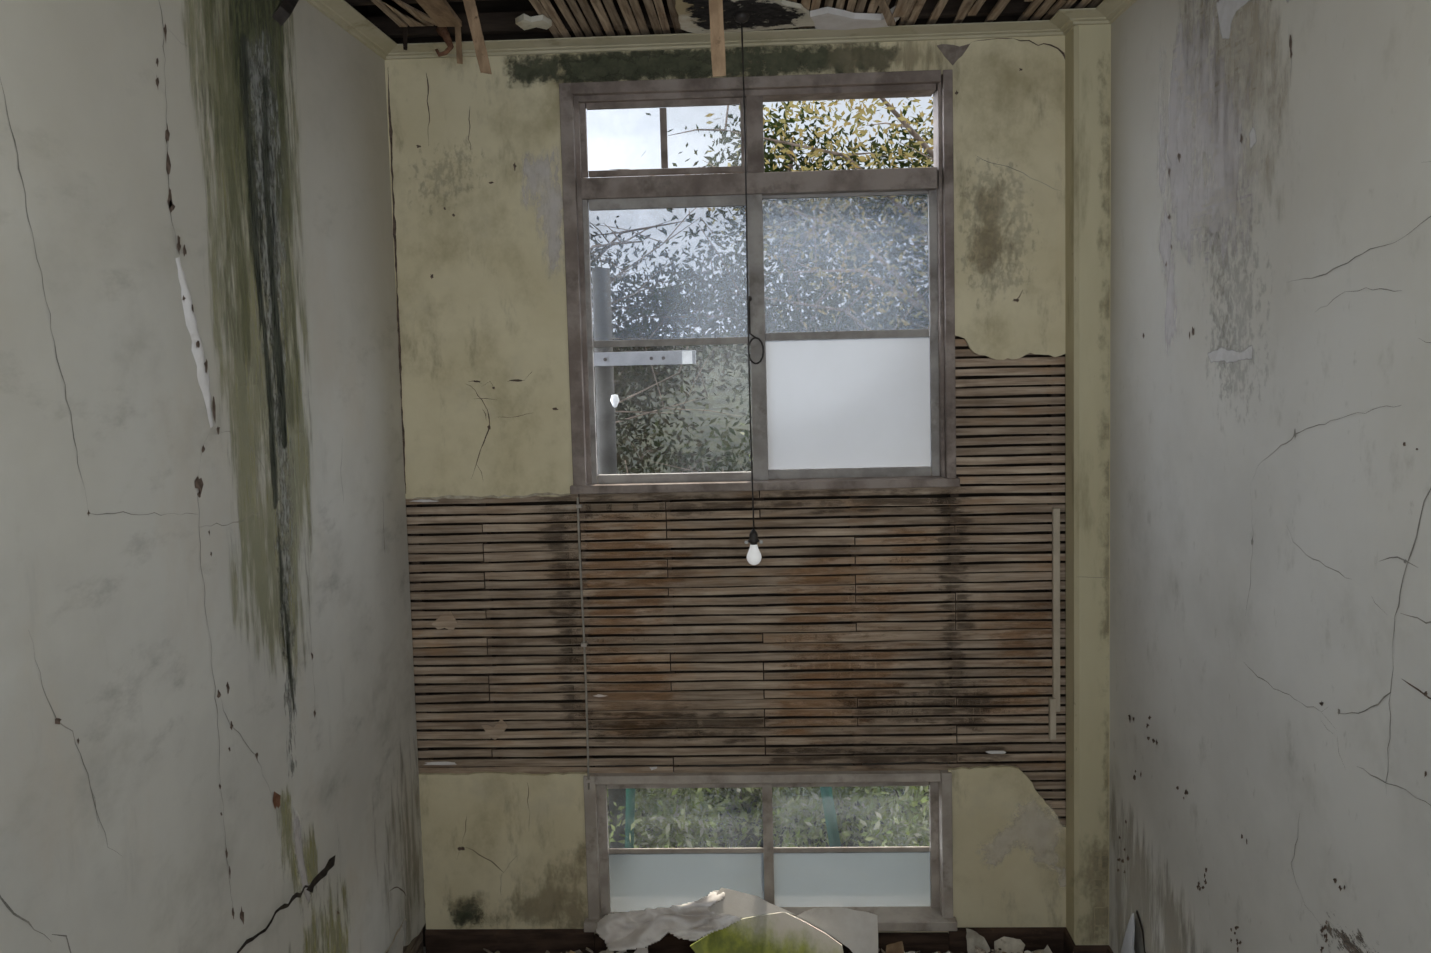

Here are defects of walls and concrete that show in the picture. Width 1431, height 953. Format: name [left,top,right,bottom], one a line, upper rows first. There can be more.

crack [156,2,199,252]
flaking render [529,0,684,38]
leakage [506,42,897,86]
leakage [682,0,805,31]
flaking render [769,0,975,30]
flaking render [1018,0,1103,21]
leakage [229,0,289,509]
crack [1293,216,1431,309]
crack [0,79,339,953]
leakage [278,529,294,711]
flaking render [406,336,1066,826]
crack [1245,488,1431,806]